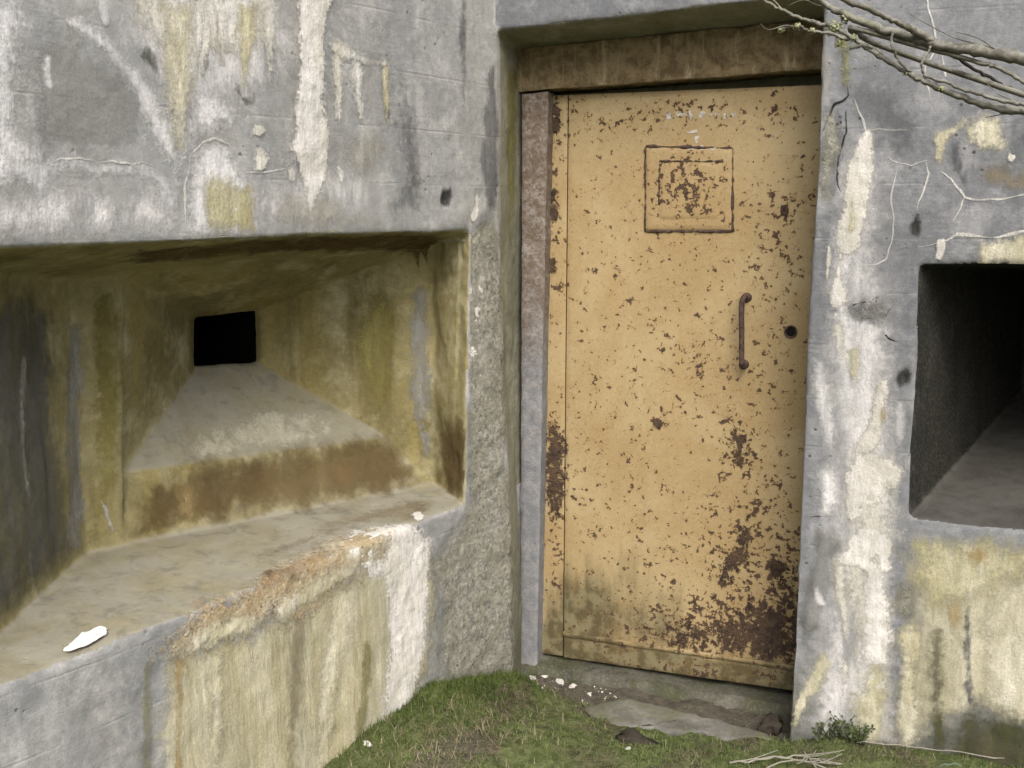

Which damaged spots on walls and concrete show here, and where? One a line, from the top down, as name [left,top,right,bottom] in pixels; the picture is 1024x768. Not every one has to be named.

leakage [0,0,389,237]
crack [822,86,849,191]
corrosion [550,188,559,221]
crack [861,156,1024,265]
leakage [0,301,84,601]
corrosion [545,419,570,520]
corrosion [730,425,753,470]
corrosion [718,514,756,587]
leakage [153,524,434,768]
corrosion [660,558,799,671]
leakage [964,616,972,702]
leakage [933,714,944,749]